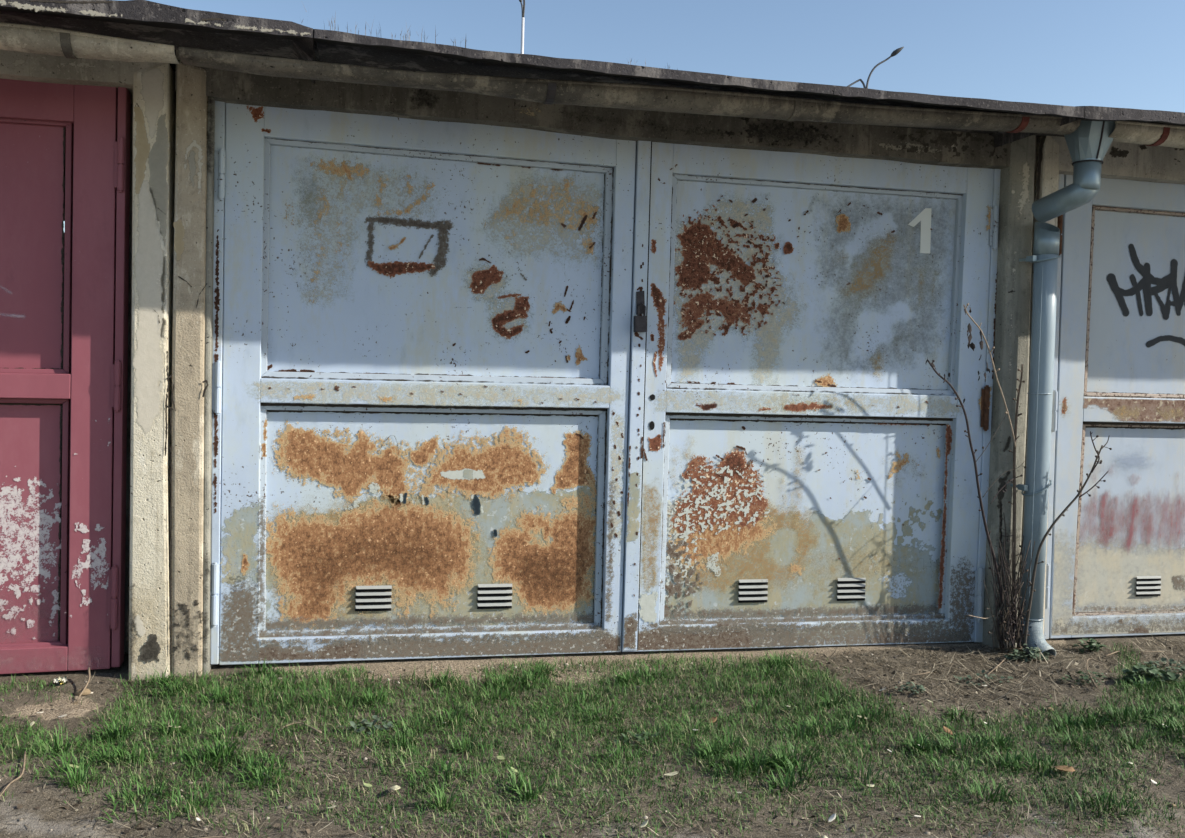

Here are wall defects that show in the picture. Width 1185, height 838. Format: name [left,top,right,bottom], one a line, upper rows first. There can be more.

peeling [0,466,109,617]
corrosion [241,418,597,630]
corrosion [467,258,530,339]
corrosion [643,422,665,461]
corrosion [639,445,817,625]
corrosion [650,195,809,385]
corrosion [813,374,848,387]
corrosion [888,452,919,479]
corrosion [936,424,953,609]
corrosion [978,274,997,409]
corrosion [1072,532,1185,615]
corrosion [1083,398,1185,422]